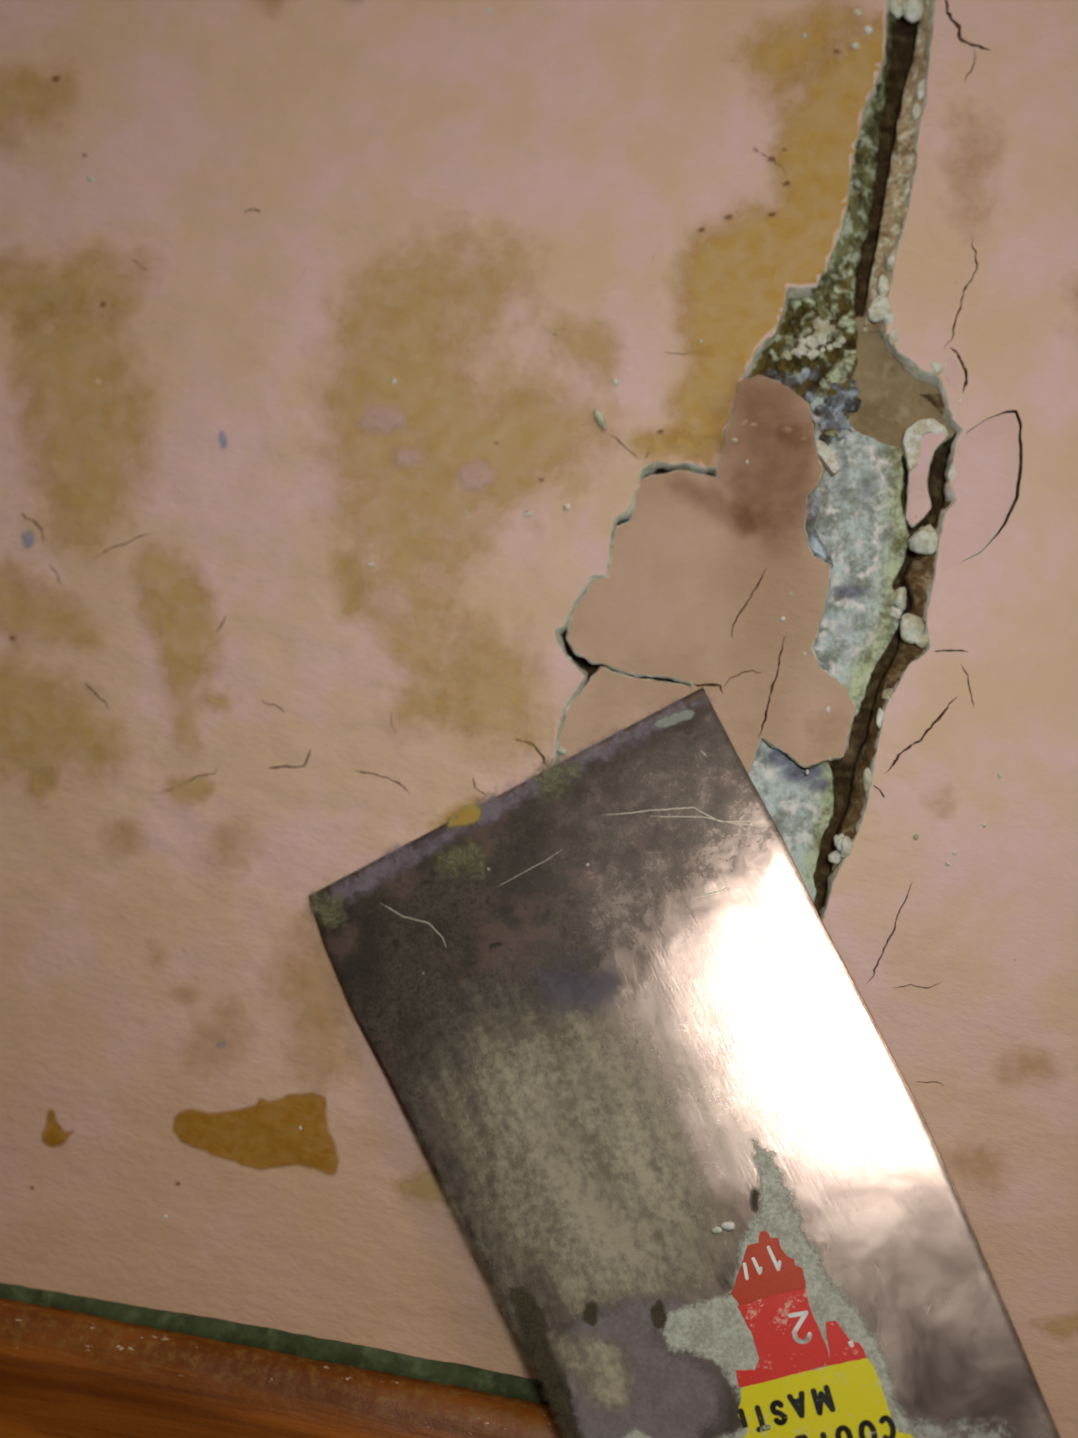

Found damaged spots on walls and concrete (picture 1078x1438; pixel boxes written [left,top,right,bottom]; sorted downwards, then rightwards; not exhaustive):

leakage [635,8,884,454]
crack [812,0,990,346]
leakage [0,670,111,794]
leakage [0,254,142,542]
leakage [142,553,213,691]
leakage [328,259,577,730]
crack [560,630,690,686]
crack [599,427,716,477]
peeling [554,0,1023,922]
crack [814,237,978,918]
leakage [43,1110,71,1146]
leakage [174,1093,338,1174]